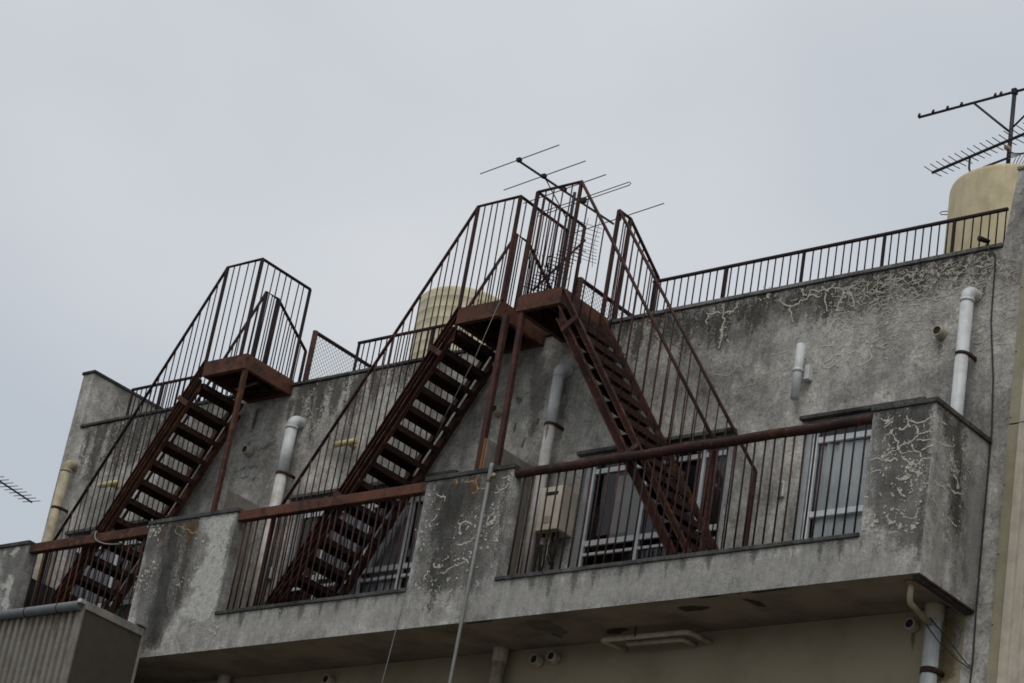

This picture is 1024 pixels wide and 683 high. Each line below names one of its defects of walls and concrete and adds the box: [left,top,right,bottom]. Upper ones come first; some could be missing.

crack [696,251,1021,395]
crack [415,475,510,540]
crack [864,408,987,561]
leakage [143,523,196,653]